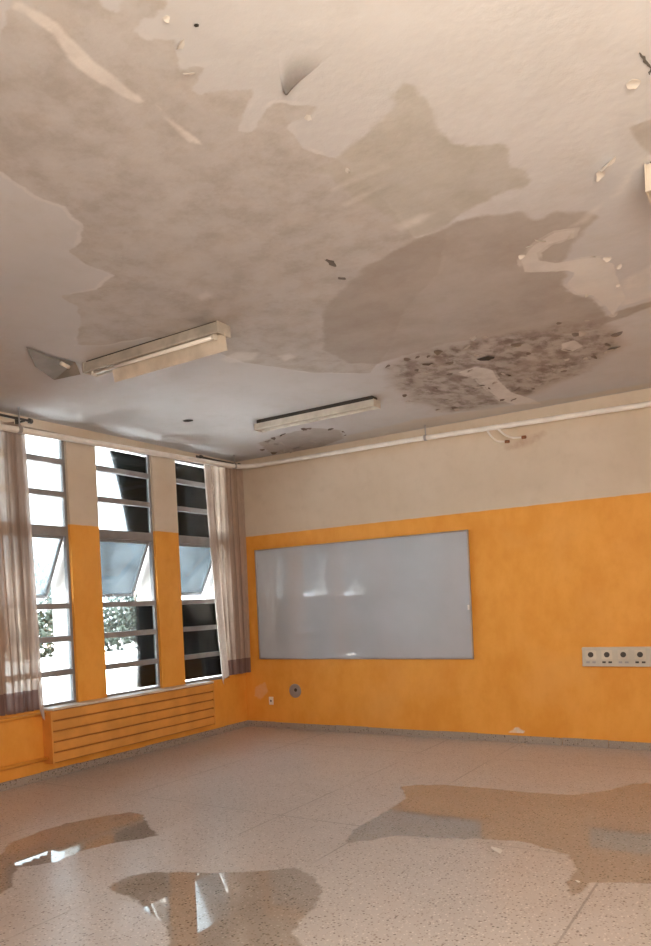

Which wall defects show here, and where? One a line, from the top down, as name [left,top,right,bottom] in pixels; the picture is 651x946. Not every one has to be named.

peeling [0,0,651,415]